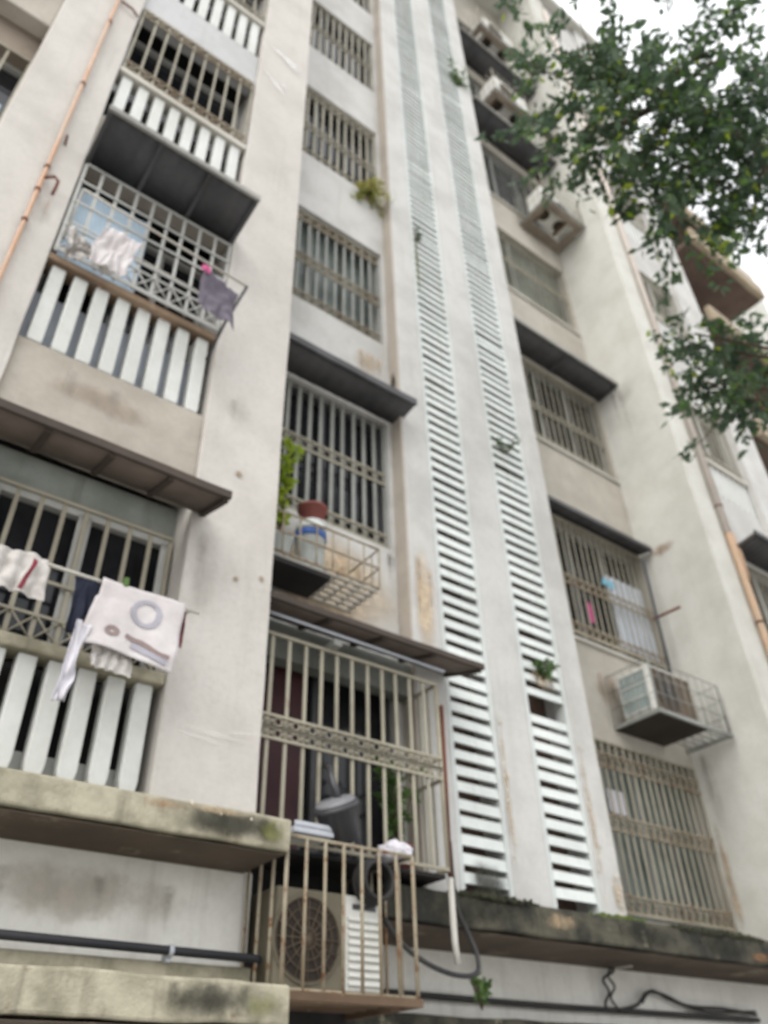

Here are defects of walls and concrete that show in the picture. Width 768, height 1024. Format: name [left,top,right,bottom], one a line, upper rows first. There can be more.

water stain [195,810,272,837]
water stain [458,867,504,921]
water stain [180,988,234,1012]